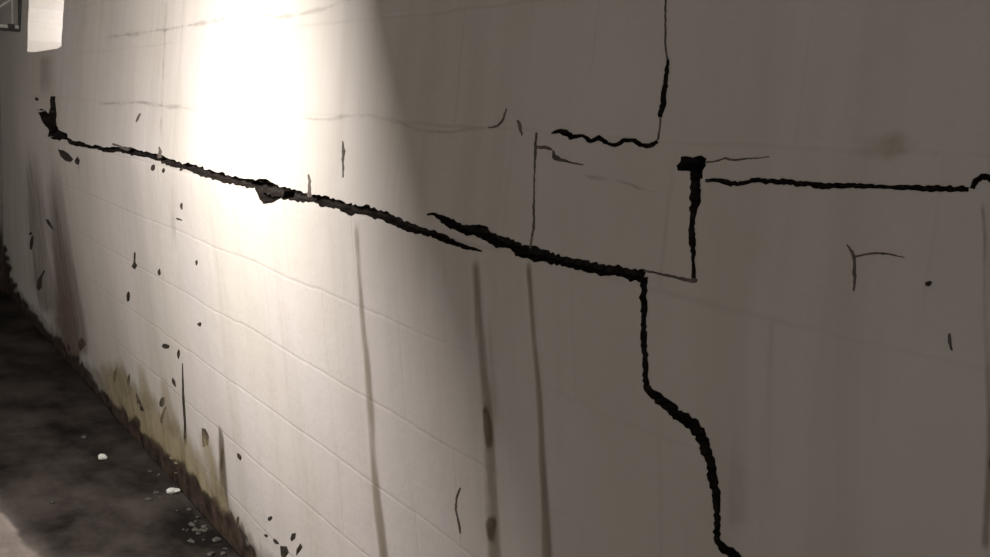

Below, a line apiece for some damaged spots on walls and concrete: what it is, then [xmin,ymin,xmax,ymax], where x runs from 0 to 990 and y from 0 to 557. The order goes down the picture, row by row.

crack [551,0,670,148]
leakage [0,208,257,557]
leakage [375,490,384,557]
crack [49,109,990,557]